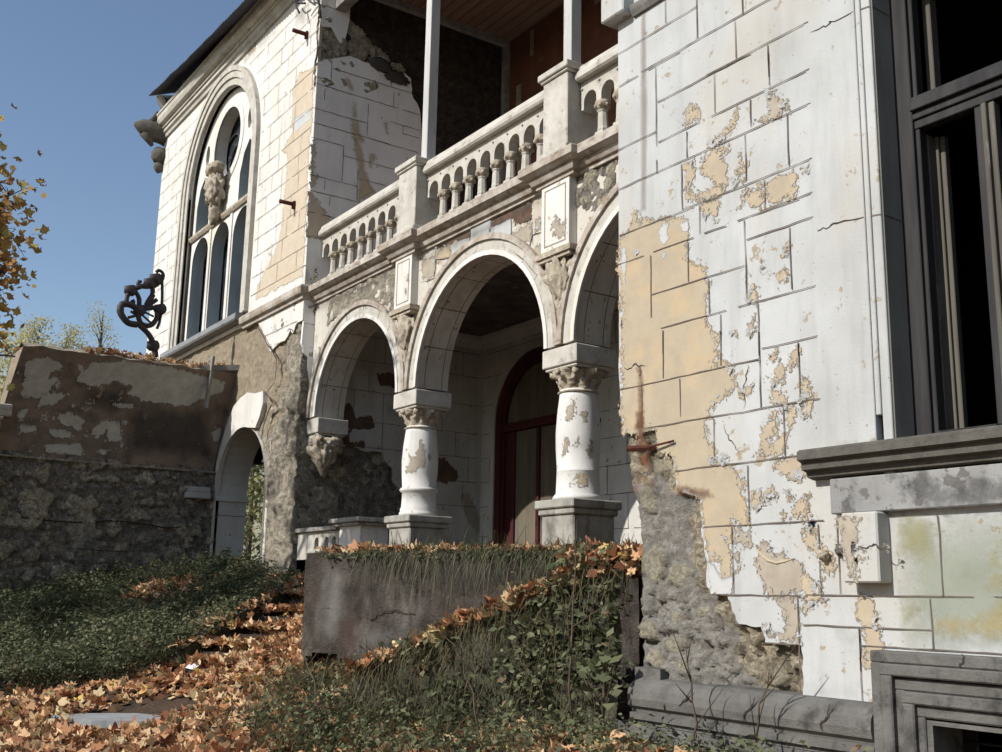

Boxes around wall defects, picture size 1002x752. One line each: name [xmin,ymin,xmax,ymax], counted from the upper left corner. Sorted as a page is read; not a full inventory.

spalling [435,25,502,156]
peeling [255,0,426,300]
spalling [447,161,493,213]
peeling [435,230,471,264]
crack [818,217,863,231]
peeling [10,356,226,457]
water stain [135,414,206,450]
peeling [404,439,458,484]
peeling [561,436,594,458]
corrosion [636,370,649,479]
peeling [615,102,885,692]
water stain [903,476,1002,503]